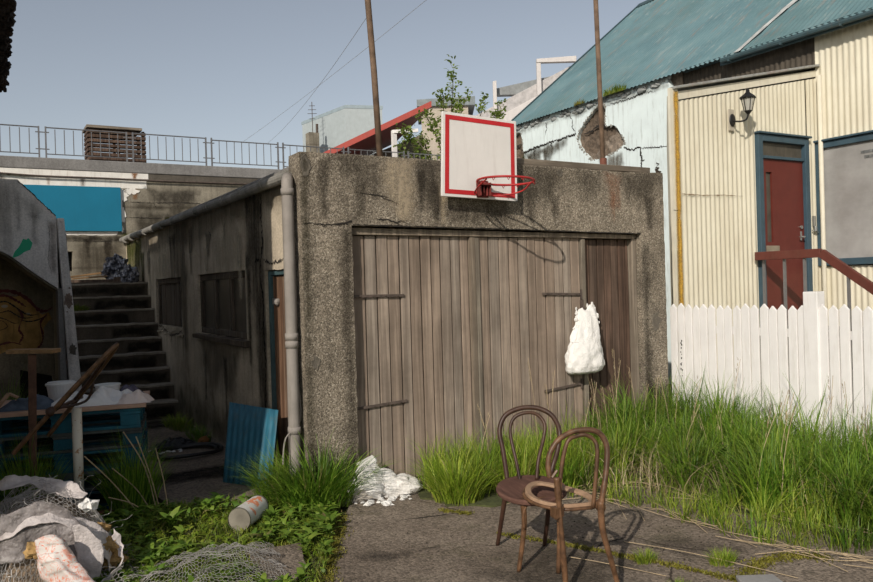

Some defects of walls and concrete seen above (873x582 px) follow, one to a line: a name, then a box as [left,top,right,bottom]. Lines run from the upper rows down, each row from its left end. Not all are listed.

spalling [516,133,524,158]
crack [523,117,576,157]
spalling [576,103,626,161]
peeling [121,188,140,233]
damp [138,190,193,230]
damp [205,197,268,408]
damp [67,228,227,437]